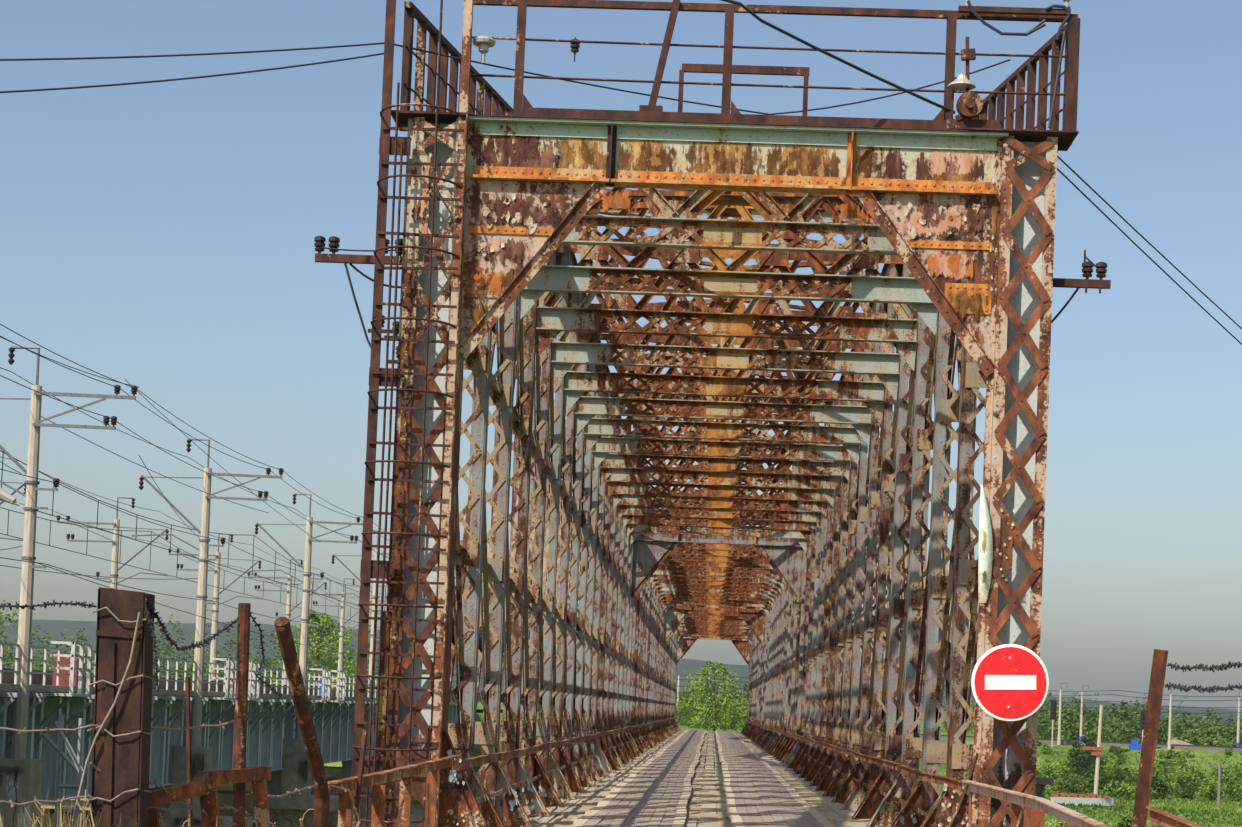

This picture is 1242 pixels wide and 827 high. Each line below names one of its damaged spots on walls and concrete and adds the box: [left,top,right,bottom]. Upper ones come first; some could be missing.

peeling [475,192,549,257]
rust [533,206,560,227]
peeling [895,159,1000,331]
rust [470,237,531,328]
rust [401,732,432,764]
rust [446,772,471,807]
peeling [898,780,969,827]